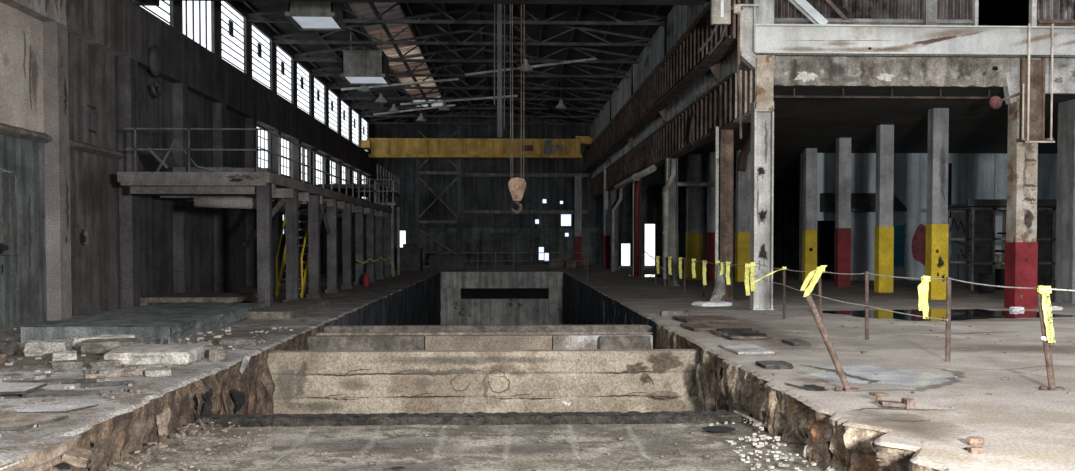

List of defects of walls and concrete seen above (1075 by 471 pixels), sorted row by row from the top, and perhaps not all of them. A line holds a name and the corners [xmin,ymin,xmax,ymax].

water stain [23,33,37,110]
rust [831,31,979,79]
spalling [44,272,441,471]
spalling [563,272,939,471]